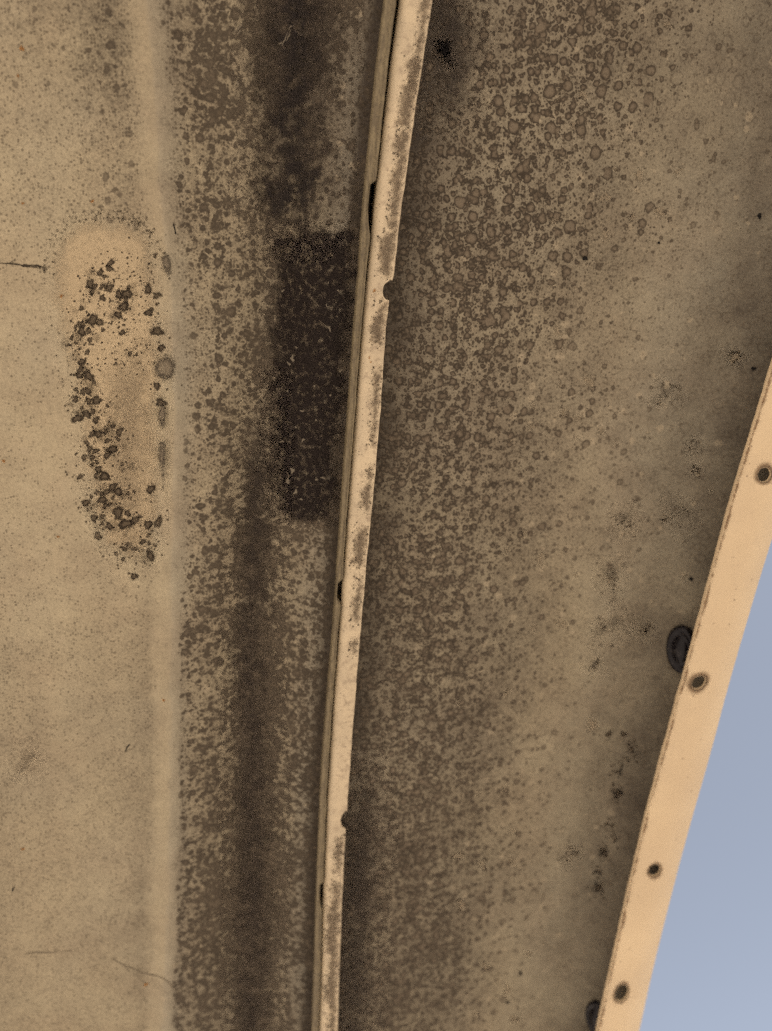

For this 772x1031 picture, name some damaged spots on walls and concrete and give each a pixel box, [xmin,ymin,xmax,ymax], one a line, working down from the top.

leakage [374,0,431,281]
leakage [46,227,170,588]
leakage [246,0,357,590]
leakage [366,366,382,446]
leakage [369,297,387,349]
leakage [347,468,374,659]
leakage [593,722,645,804]
leakage [322,830,368,1031]
leakage [585,818,620,900]